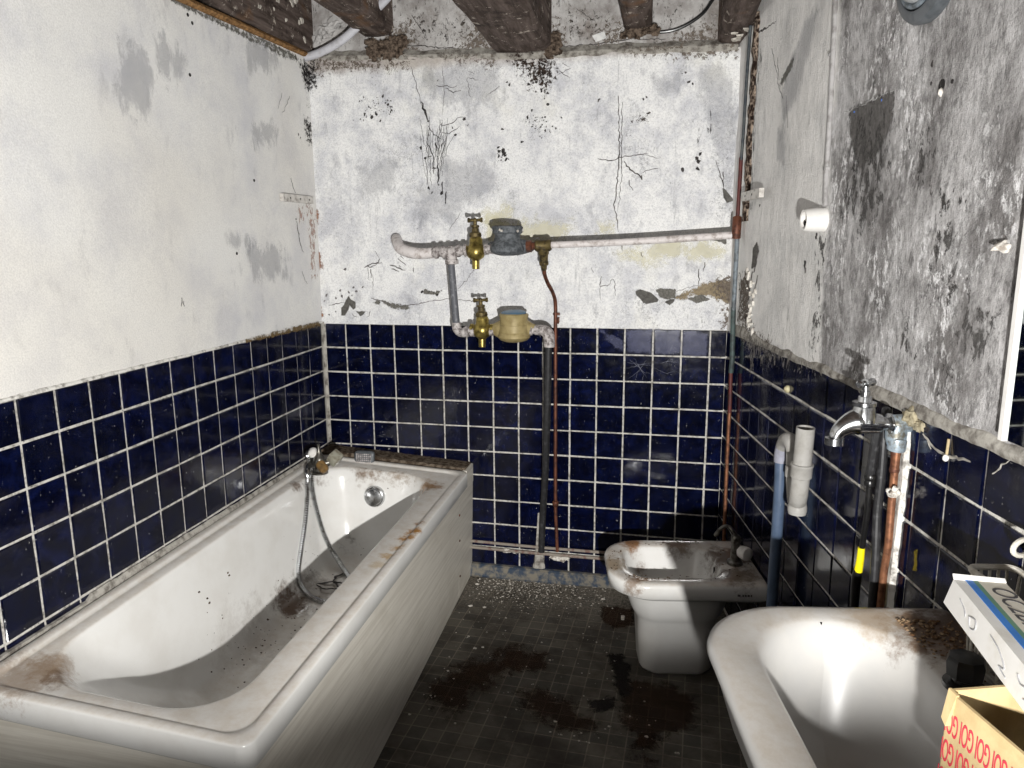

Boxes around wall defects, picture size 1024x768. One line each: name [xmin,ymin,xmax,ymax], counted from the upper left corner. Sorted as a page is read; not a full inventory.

crack [600,96,658,247]
damp [840,104,895,239]
damp [907,126,1005,370]
flaking render [324,286,410,317]
flaking render [636,288,676,305]
flaking render [688,295,710,304]
damp [896,318,981,413]
damp [588,653,633,713]